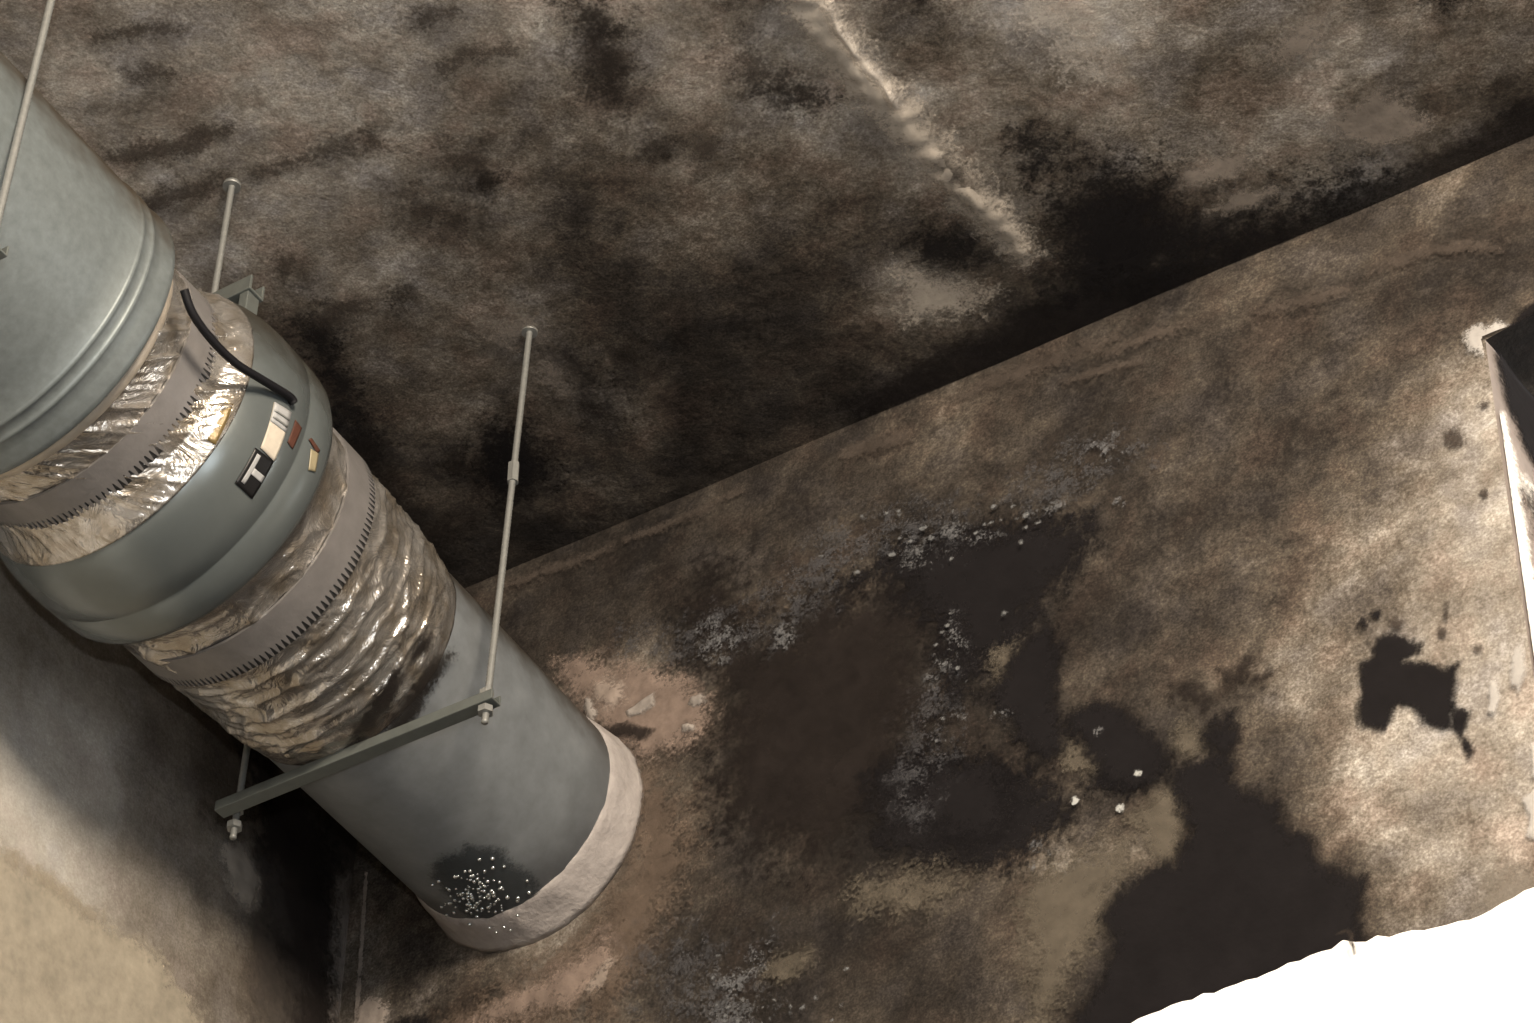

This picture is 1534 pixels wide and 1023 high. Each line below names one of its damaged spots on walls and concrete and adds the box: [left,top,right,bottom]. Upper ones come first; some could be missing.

water stain [549,0,658,130]
water stain [711,25,844,111]
water stain [848,78,1534,412]
water stain [266,298,456,543]
water stain [438,401,569,511]
water stain [1478,349,1534,652]
water stain [1355,609,1474,759]
water stain [660,496,1370,1023]
water stain [0,848,202,1023]
water stain [431,844,539,919]
water stain [467,924,625,1023]
water stain [1461,863,1534,919]